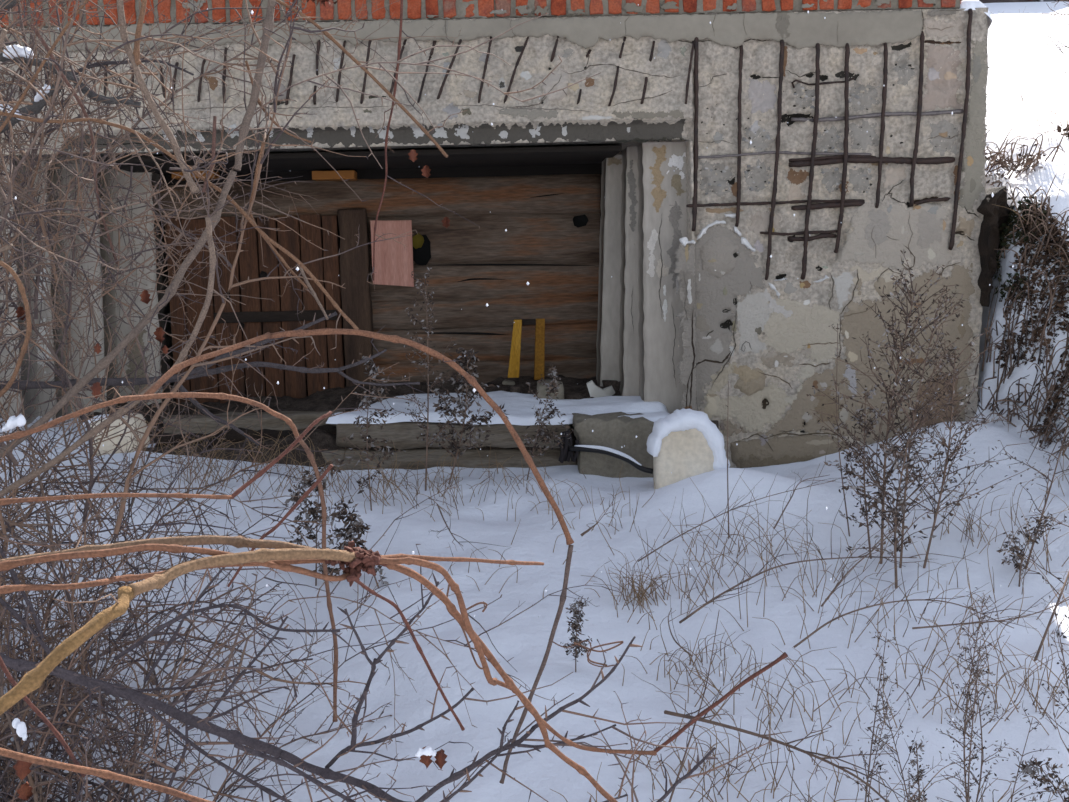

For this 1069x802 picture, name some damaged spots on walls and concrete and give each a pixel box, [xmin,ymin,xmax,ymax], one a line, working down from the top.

spalling [891,17,965,112]
peeling [369,126,393,139]
peeling [410,123,470,139]
spalling [723,71,894,153]
peeling [666,152,686,179]
spalling [787,184,806,201]
rust [787,168,809,185]
spalling [858,126,906,193]
peeling [647,230,670,278]
spalling [679,210,782,258]
peeling [814,257,912,309]
peeling [702,274,793,354]